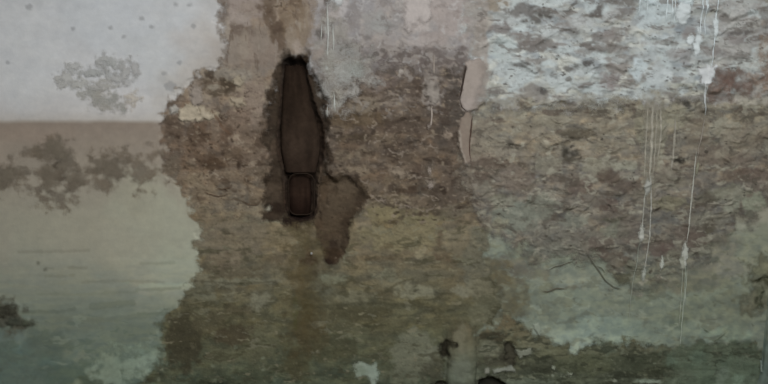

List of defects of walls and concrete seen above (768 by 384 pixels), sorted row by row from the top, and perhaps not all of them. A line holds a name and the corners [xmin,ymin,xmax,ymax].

water stain [0,132,166,216]
peeling [53,51,144,119]
flaking render [138,0,504,384]
water stain [259,1,387,265]
flaking render [471,309,763,384]
efflorescence [629,98,680,317]
water stain [678,84,708,344]
flaking render [731,249,768,319]